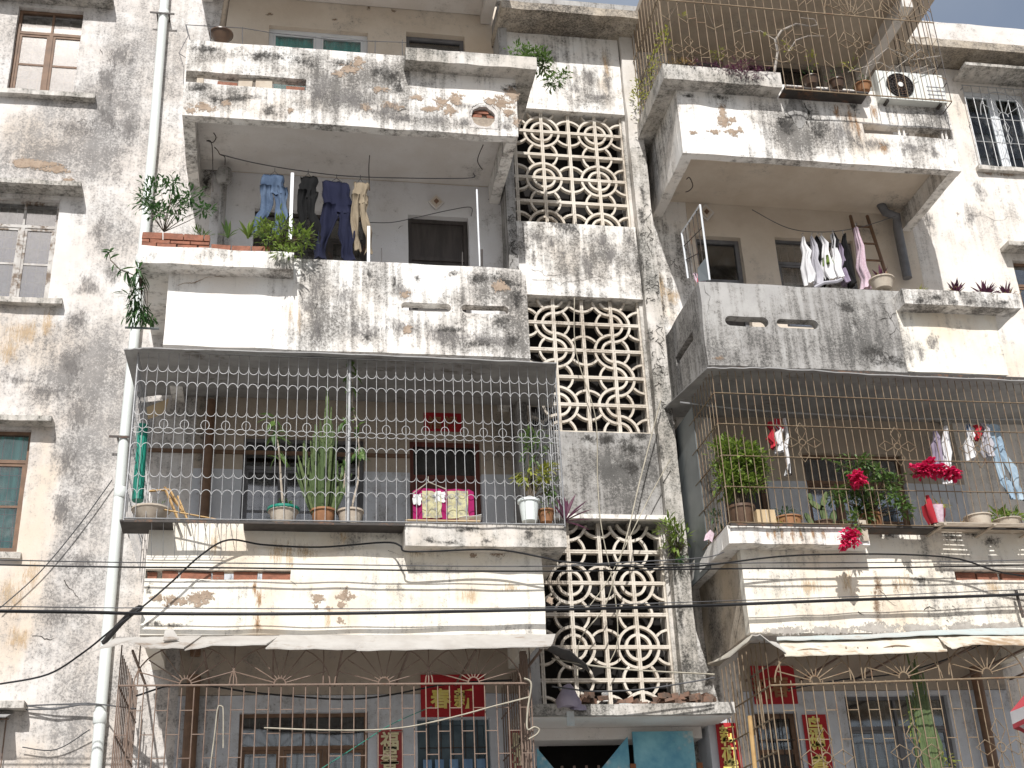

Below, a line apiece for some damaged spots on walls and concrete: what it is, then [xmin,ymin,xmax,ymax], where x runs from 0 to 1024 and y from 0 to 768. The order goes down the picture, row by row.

peeling [331,56,366,77]
damp [63,48,137,140]
flaking render [359,85,522,129]
peeling [690,102,743,137]
damp [806,104,889,148]
peeling [9,156,75,181]
damp [430,272,521,347]
damp [348,324,379,340]
damp [861,346,906,368]
damp [53,497,68,524]
peeling [149,590,216,607]
peeling [311,586,356,624]